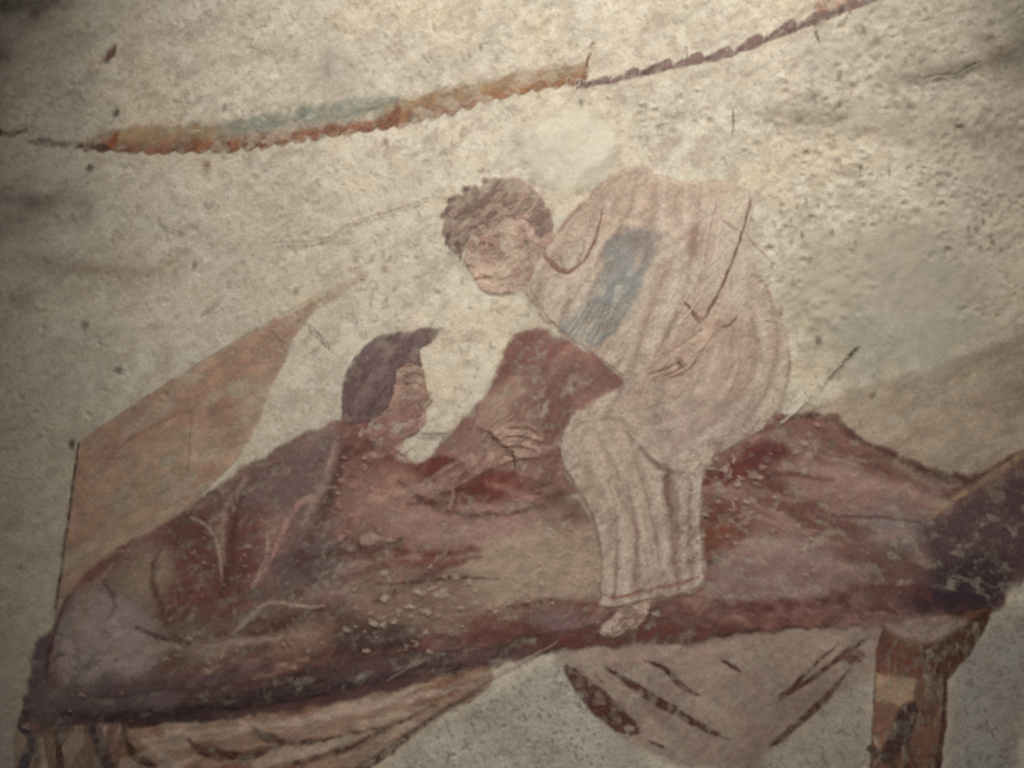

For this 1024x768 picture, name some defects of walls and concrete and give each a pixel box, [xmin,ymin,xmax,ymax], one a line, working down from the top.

crack [781,348,857,423]
crack [480,430,516,464]